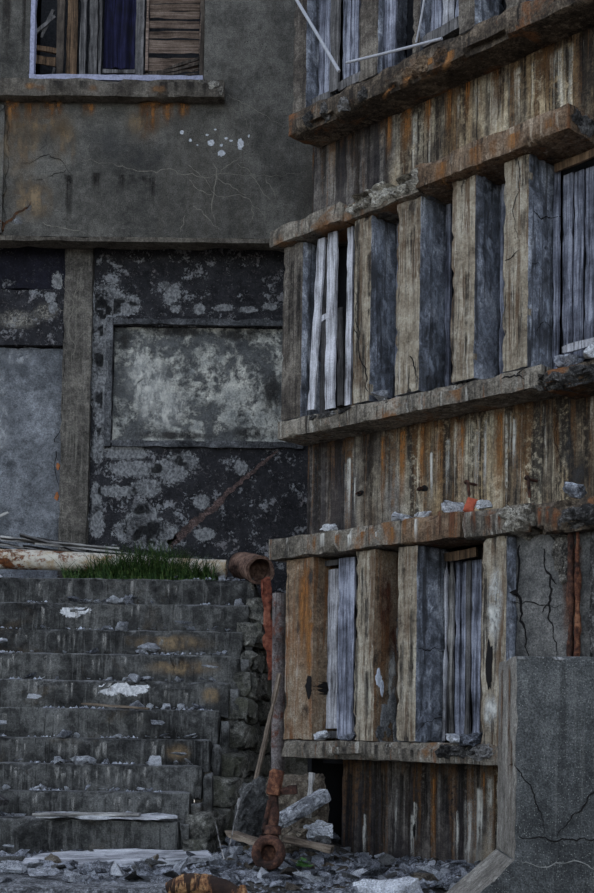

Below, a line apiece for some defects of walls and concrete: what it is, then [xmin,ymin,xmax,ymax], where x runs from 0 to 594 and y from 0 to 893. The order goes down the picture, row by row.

crack [0,104,304,233]
peeling [180,129,250,157]
spalling [346,167,419,215]
spalling [533,364,594,393]
crack [509,545,562,656]
spalling [497,503,594,586]
rust [566,532,582,657]
crack [510,763,594,870]